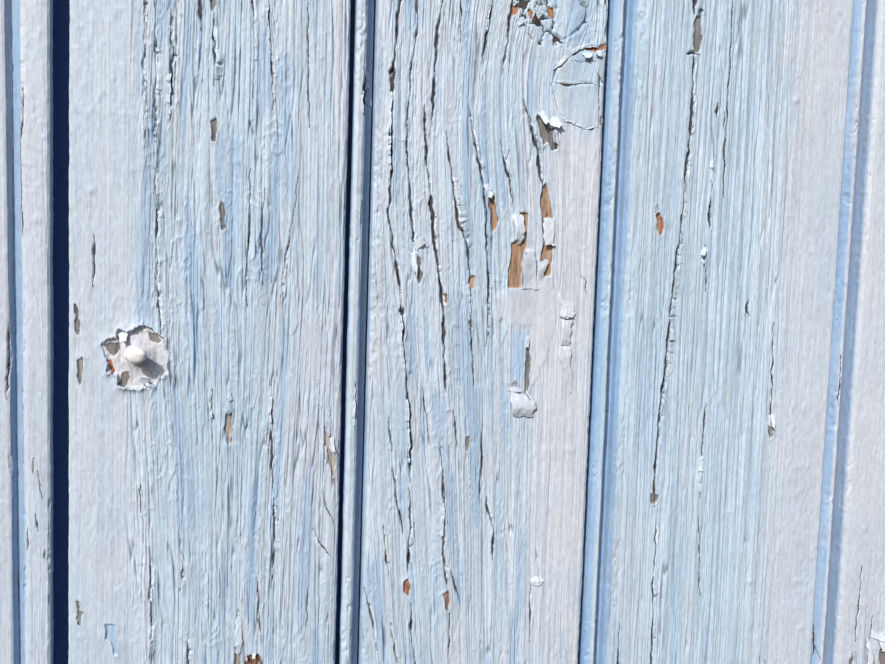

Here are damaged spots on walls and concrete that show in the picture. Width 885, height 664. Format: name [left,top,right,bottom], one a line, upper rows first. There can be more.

peeling [511,0,563,46]
peeling [536,93,602,150]
peeling [482,183,499,232]
peeling [508,184,556,291]
peeling [655,203,664,236]
peeling [102,326,168,389]
crack [359,0,513,664]
peeling [508,327,537,418]
crack [650,1,733,664]
crack [350,384,358,427]
crack [855,565,873,661]
peeling [849,630,885,664]